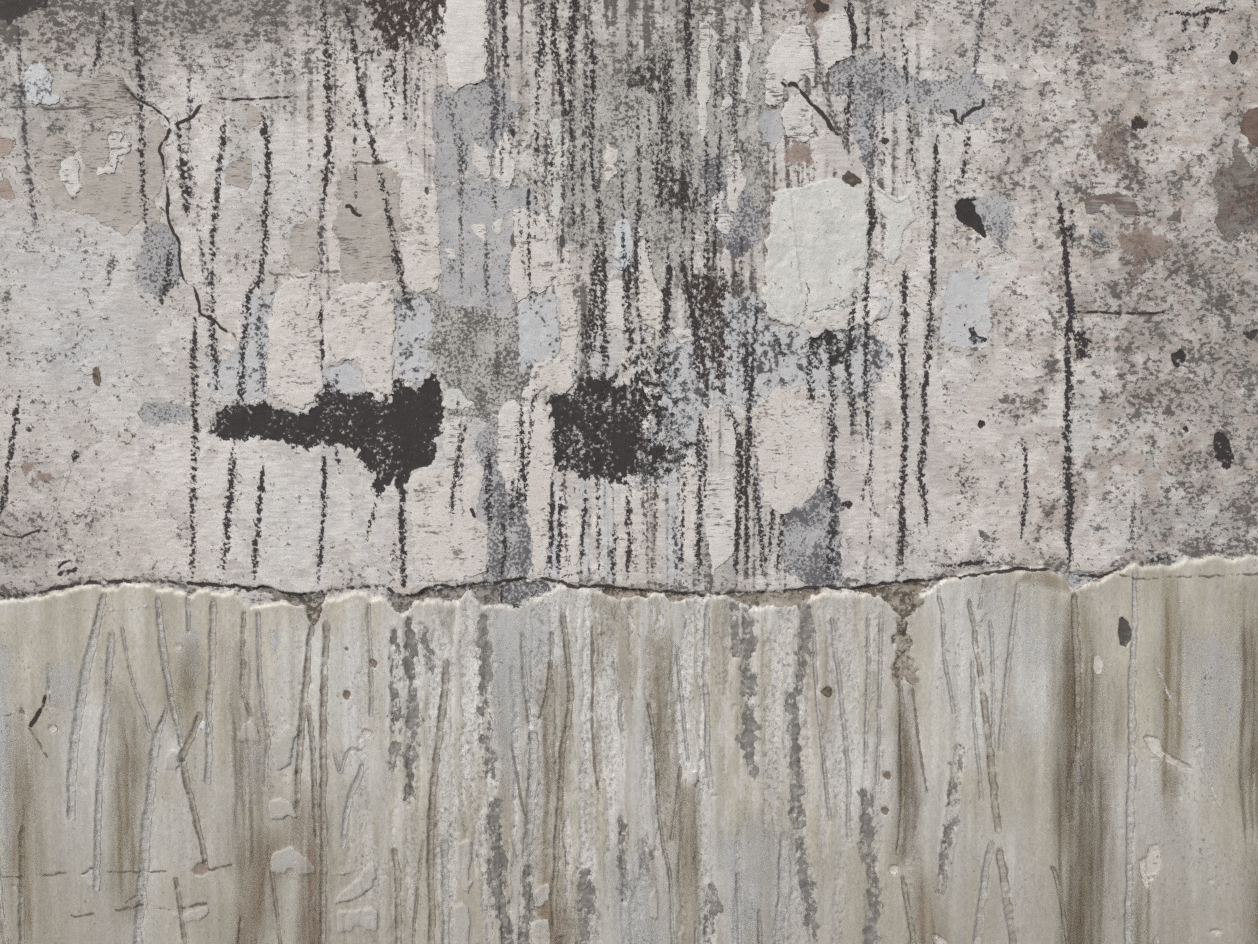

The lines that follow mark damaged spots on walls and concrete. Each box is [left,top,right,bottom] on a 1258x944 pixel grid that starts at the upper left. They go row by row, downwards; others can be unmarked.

crack [126,88,292,337]
peeling [202,0,993,613]
peeling [954,191,1015,254]
crack [3,530,47,538]
spalling [238,586,377,944]
spalling [391,659,450,944]
spalling [507,614,574,944]
spalling [590,626,599,789]
crack [0,560,1258,603]
spalling [647,592,713,944]
spalling [812,581,956,944]
spalling [967,578,1021,944]